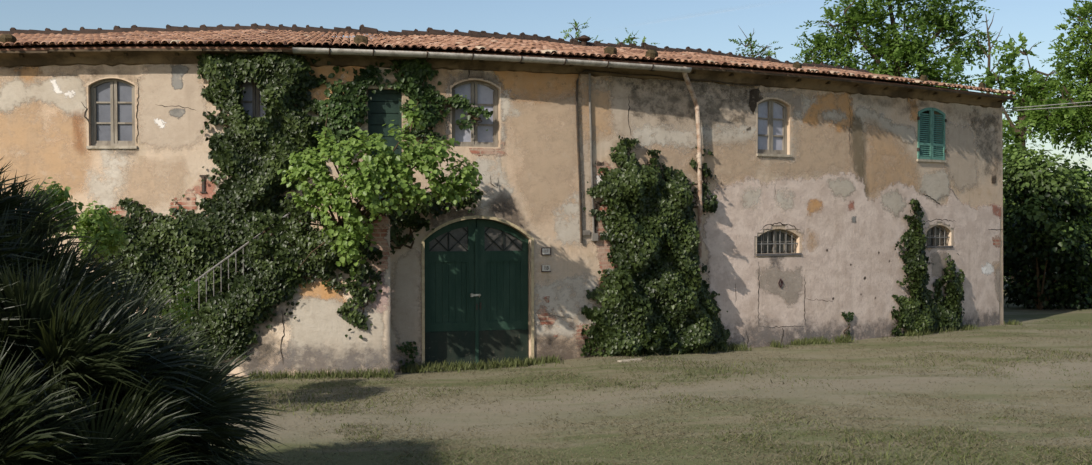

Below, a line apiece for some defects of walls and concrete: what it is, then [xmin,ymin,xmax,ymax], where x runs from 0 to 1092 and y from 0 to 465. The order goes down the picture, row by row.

peeling [0,66,130,221]
peeling [136,64,210,150]
flaking render [169,180,216,218]
peeling [411,68,450,149]
peeling [469,71,1001,348]
peeling [285,215,422,371]